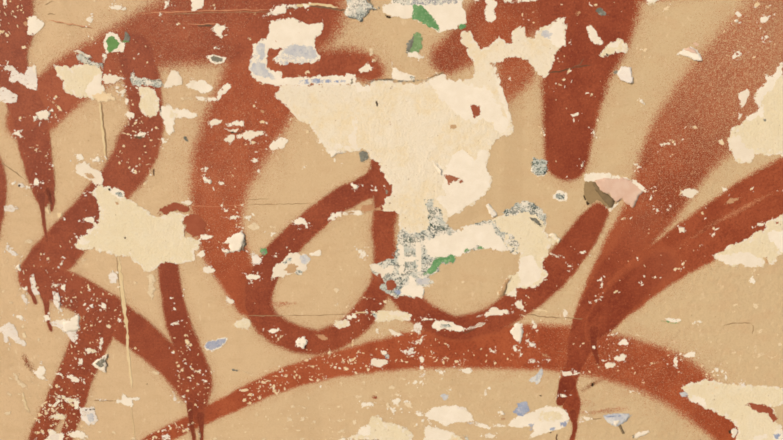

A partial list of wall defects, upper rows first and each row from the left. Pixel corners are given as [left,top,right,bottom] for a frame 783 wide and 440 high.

peeling [0,0,44,37]
peeling [254,0,311,22]
peeling [474,0,536,23]
peeling [576,11,629,58]
peeling [0,61,38,103]
peeling [716,62,783,164]
peeling [12,48,288,300]
peeling [577,158,671,220]
peeling [232,12,584,440]
peeling [712,214,783,287]
peeling [0,243,130,440]
peeling [559,330,783,440]